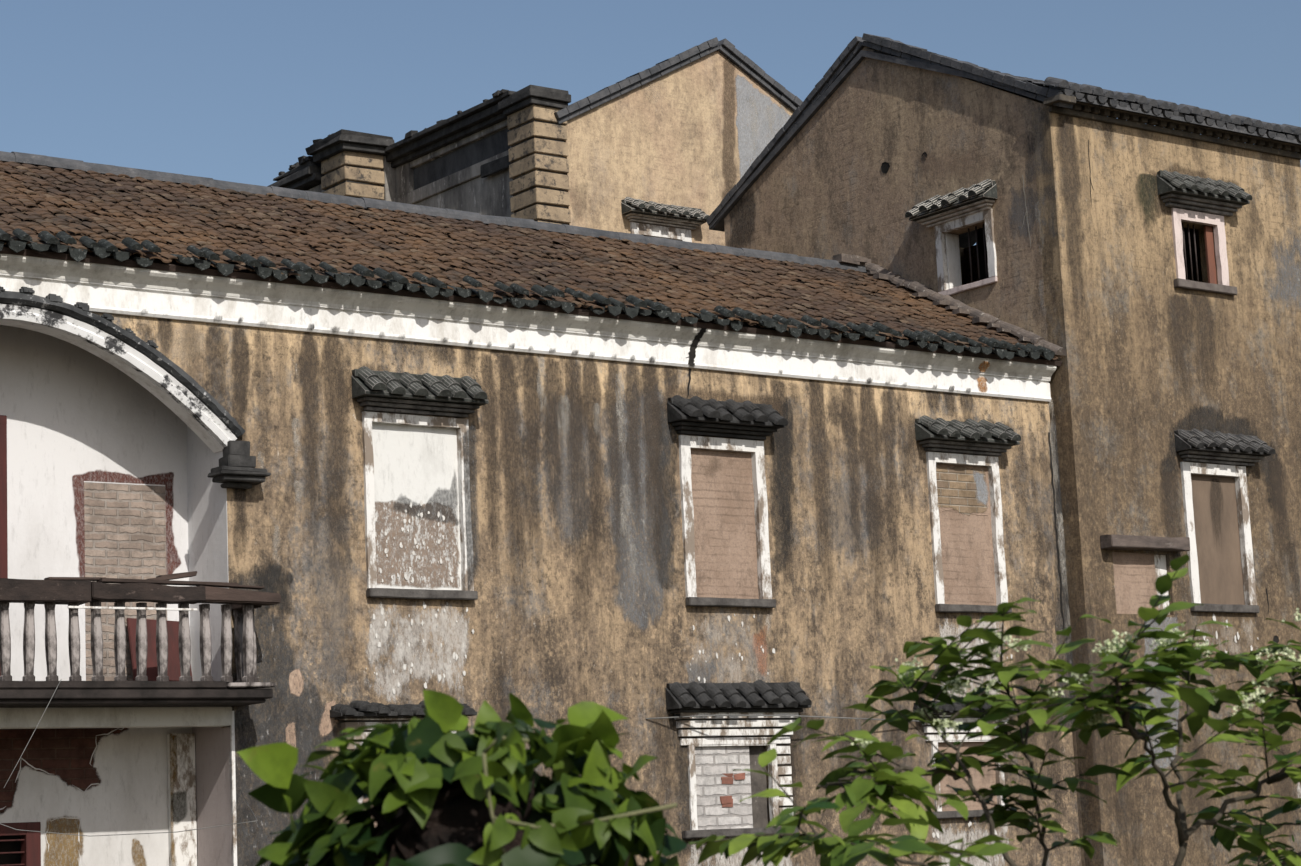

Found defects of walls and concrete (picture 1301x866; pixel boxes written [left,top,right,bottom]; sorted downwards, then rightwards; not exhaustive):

water stain [723,60,736,198]
water stain [207,326,249,441]
water stain [293,333,348,540]
water stain [433,344,678,630]
water stain [810,381,831,579]
water stain [842,385,898,597]
water stain [926,391,972,413]
peeling [366,500,474,700]
spalling [0,728,128,814]
water stain [785,731,799,807]
spalling [44,816,83,866]
peeling [690,845,792,866]